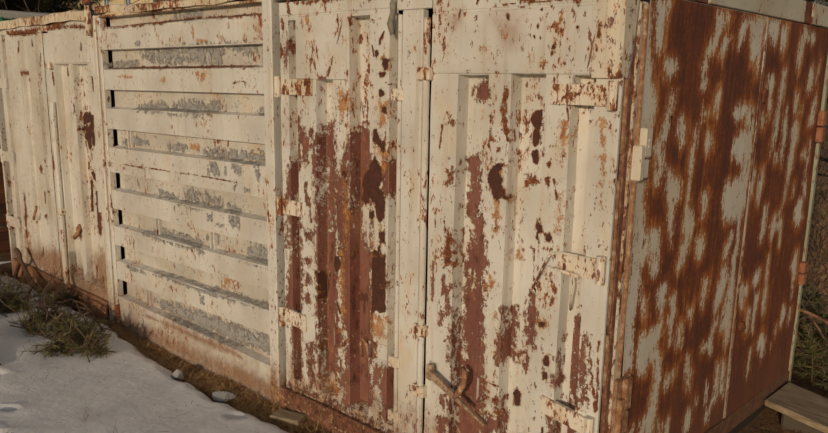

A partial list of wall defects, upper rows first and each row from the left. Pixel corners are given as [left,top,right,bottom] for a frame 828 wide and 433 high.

peeling [103,40,263,69]
rust [73,104,95,149]
peeling [132,97,226,119]
peeling [142,187,241,258]
peeling [197,146,266,193]
peeling [239,241,268,270]
rust [341,31,397,347]
rust [487,162,517,238]
rust [522,105,577,243]
rust [624,0,828,433]
peeling [126,264,270,356]
rust [482,381,522,417]